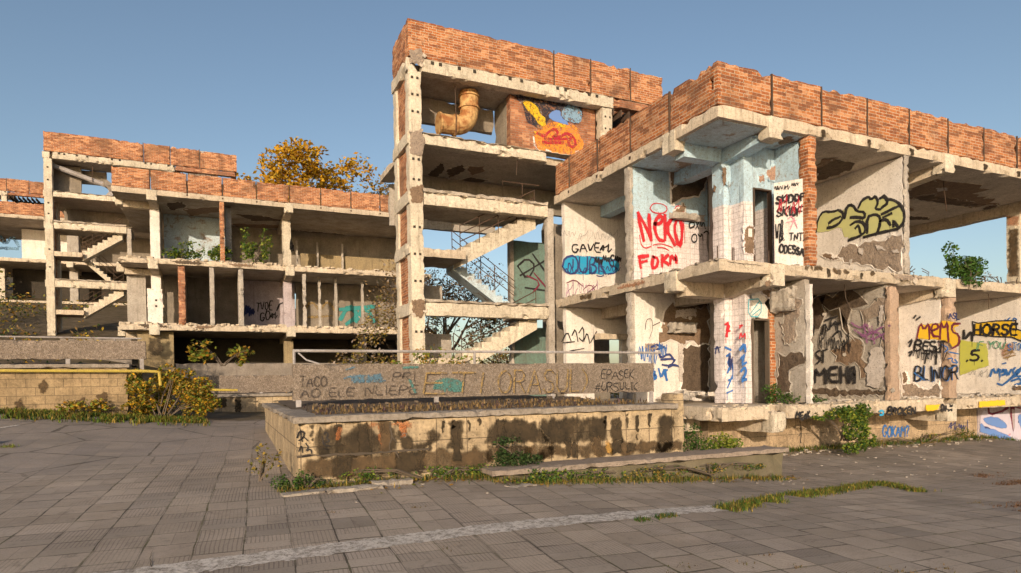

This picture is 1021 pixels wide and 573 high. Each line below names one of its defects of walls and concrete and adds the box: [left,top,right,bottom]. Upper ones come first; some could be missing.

spalling [668,161,732,221]
spalling [816,158,857,181]
spalling [908,178,1001,220]
peeling [819,233,924,284]
peeling [643,299,711,394]
peeling [776,289,943,399]
water stain [298,413,682,479]